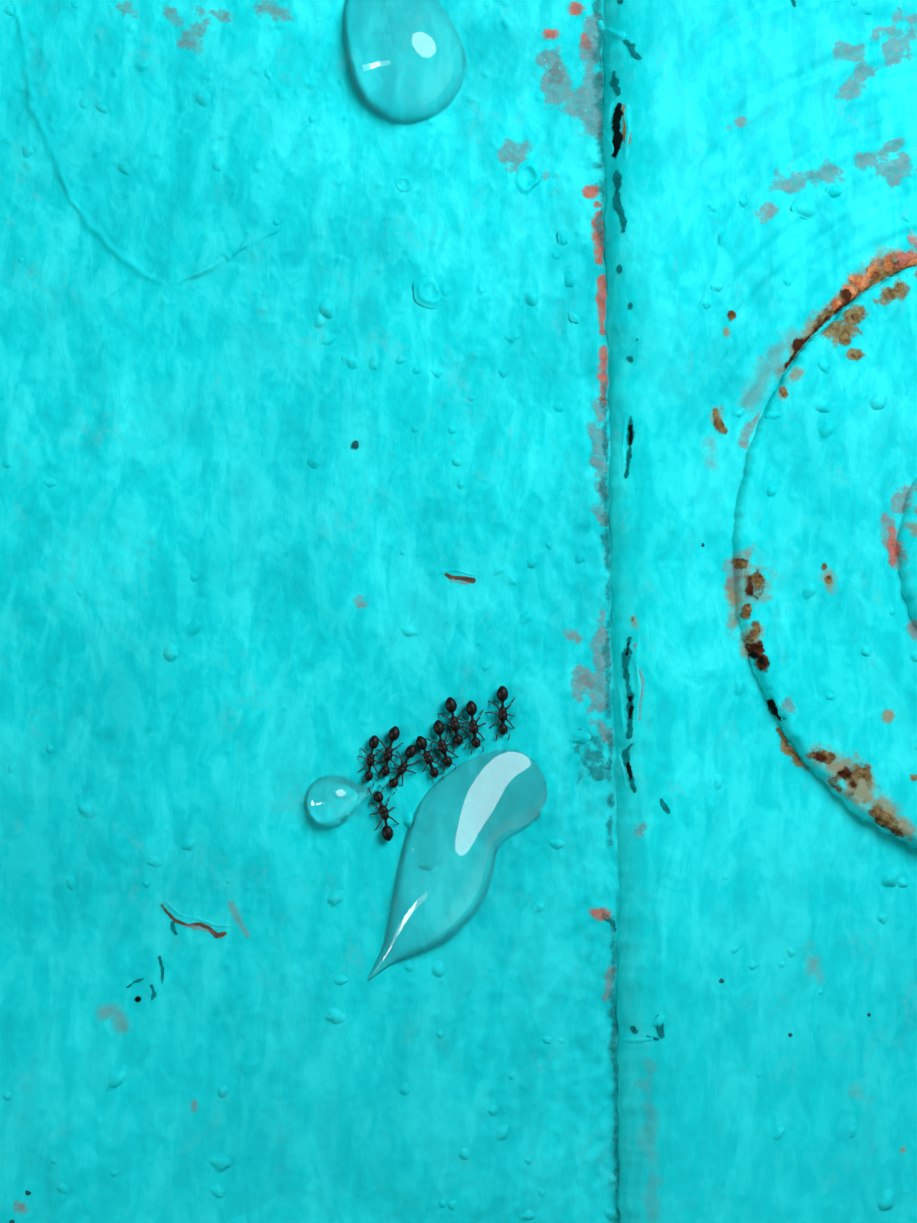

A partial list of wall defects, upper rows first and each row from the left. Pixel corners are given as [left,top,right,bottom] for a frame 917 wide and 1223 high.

crack [596,0,642,233]
rust [779,236,917,397]
rust [713,408,728,434]
rust [726,553,770,672]
crack [611,635,670,814]
rust [777,727,913,837]